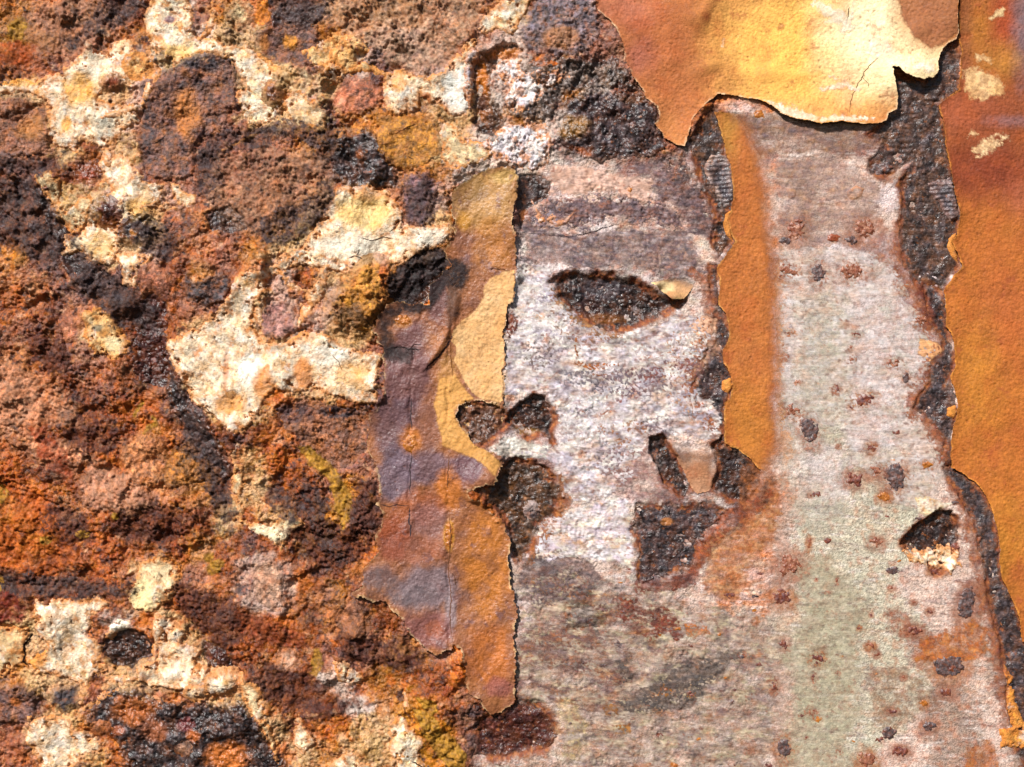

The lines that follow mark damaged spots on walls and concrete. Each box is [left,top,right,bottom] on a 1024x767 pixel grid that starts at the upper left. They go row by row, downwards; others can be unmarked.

corrosion [0,154,161,331]
corrosion [254,181,335,245]
peeling [166,0,575,767]
corrosion [505,311,518,338]
spalling [553,268,693,334]
peeling [596,0,1024,767]
corrosion [737,109,949,469]
corrosion [0,482,140,625]
corrosion [265,477,381,568]
corrosion [843,442,912,518]
corrosion [905,486,1009,734]
corrosion [852,708,912,767]